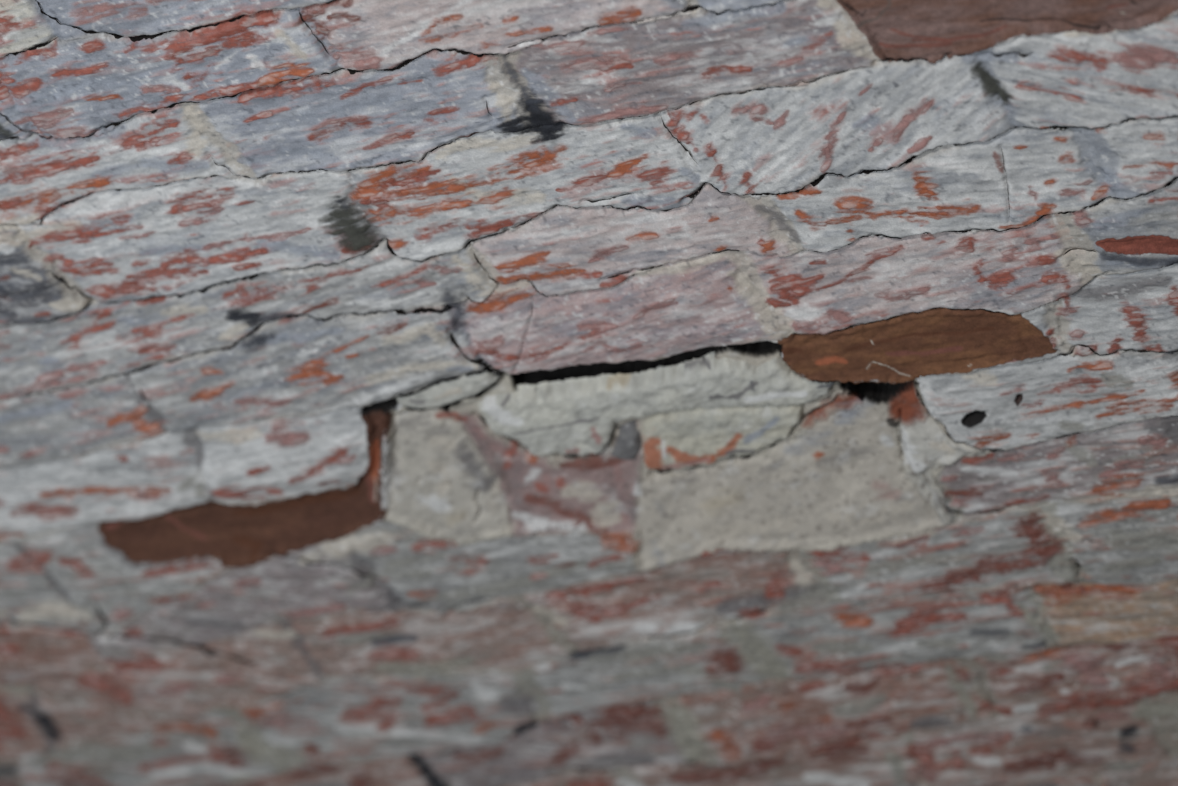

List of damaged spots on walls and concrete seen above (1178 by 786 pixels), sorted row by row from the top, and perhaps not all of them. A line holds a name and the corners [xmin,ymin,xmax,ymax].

crack [5,0,260,57]
crack [280,0,776,83]
crack [879,52,1033,62]
spalling [837,0,1178,64]
peeling [45,228,311,349]
peeling [351,148,564,248]
peeling [468,233,658,313]
crack [0,71,1178,407]
peeling [556,157,671,192]
spalling [1095,235,1178,255]
peeling [1054,307,1178,418]
spalling [98,287,1060,637]